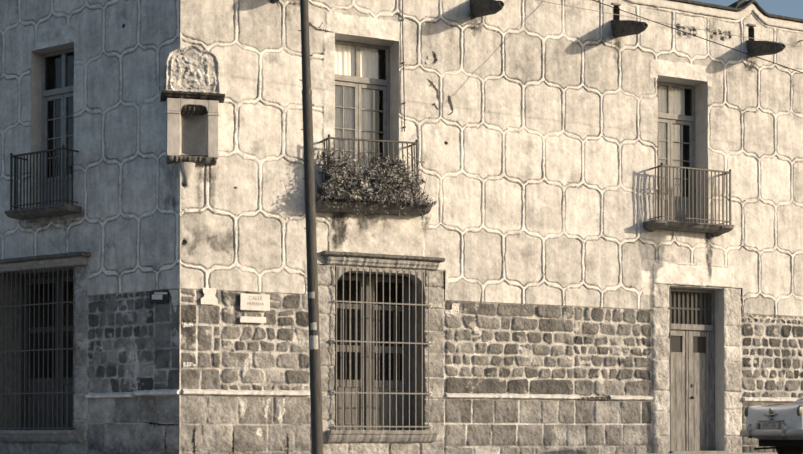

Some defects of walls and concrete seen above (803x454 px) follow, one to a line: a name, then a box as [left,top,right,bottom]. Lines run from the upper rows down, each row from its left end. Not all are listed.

leakage [332,213,348,248]
crack [144,422,196,454]